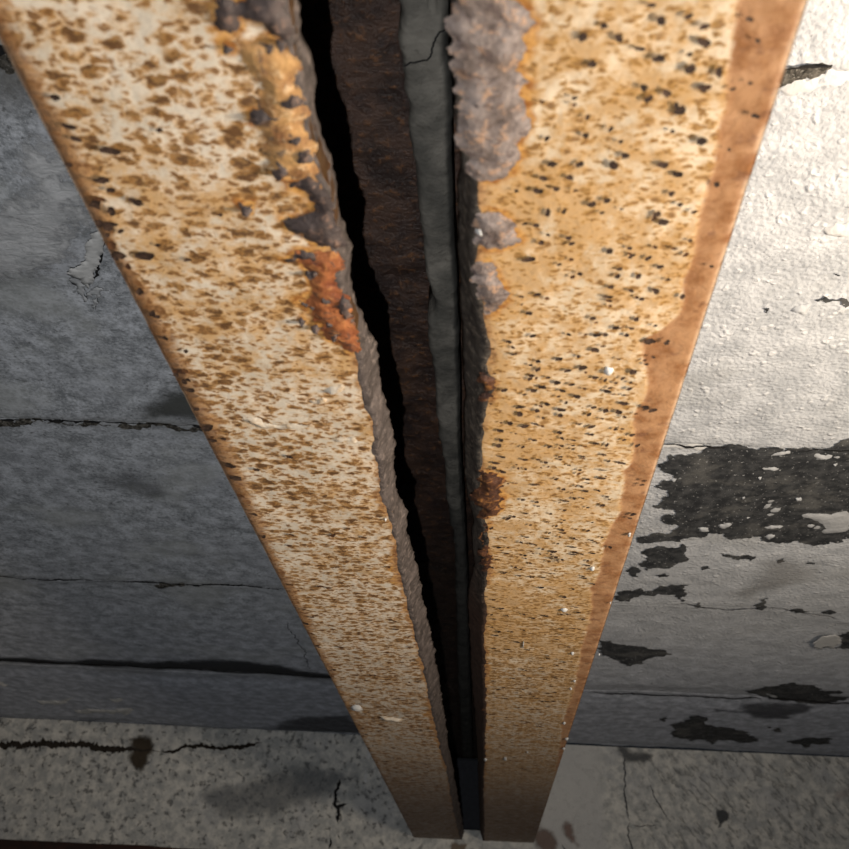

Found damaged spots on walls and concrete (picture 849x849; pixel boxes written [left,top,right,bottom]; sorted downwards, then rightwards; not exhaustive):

crack [0,45,16,75]
peeling [779,68,849,96]
crack [0,418,203,433]
peeling [614,439,849,602]
crack [0,660,235,673]
peeling [597,641,672,666]
peeling [745,682,849,704]
crack [0,724,262,754]
corrosion [130,736,153,770]
peeling [660,715,759,744]
corrosion [535,829,557,849]
corrosion [564,823,574,841]